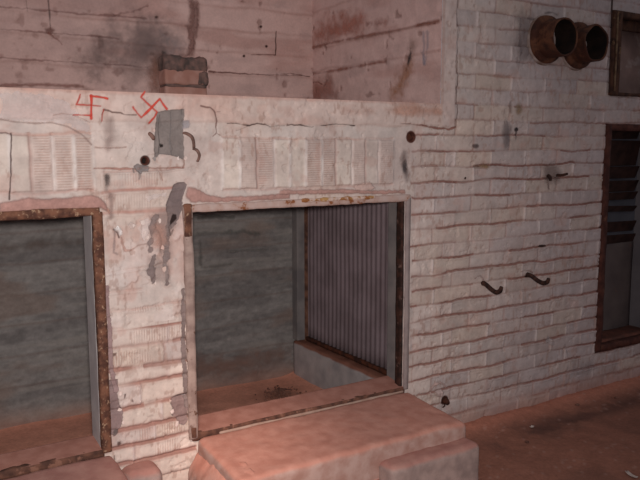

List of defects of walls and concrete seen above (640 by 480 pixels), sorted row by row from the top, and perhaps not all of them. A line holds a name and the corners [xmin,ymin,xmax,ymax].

crack [200,105,266,136]
spalling [128,182,186,286]
spalling [169,288,188,427]